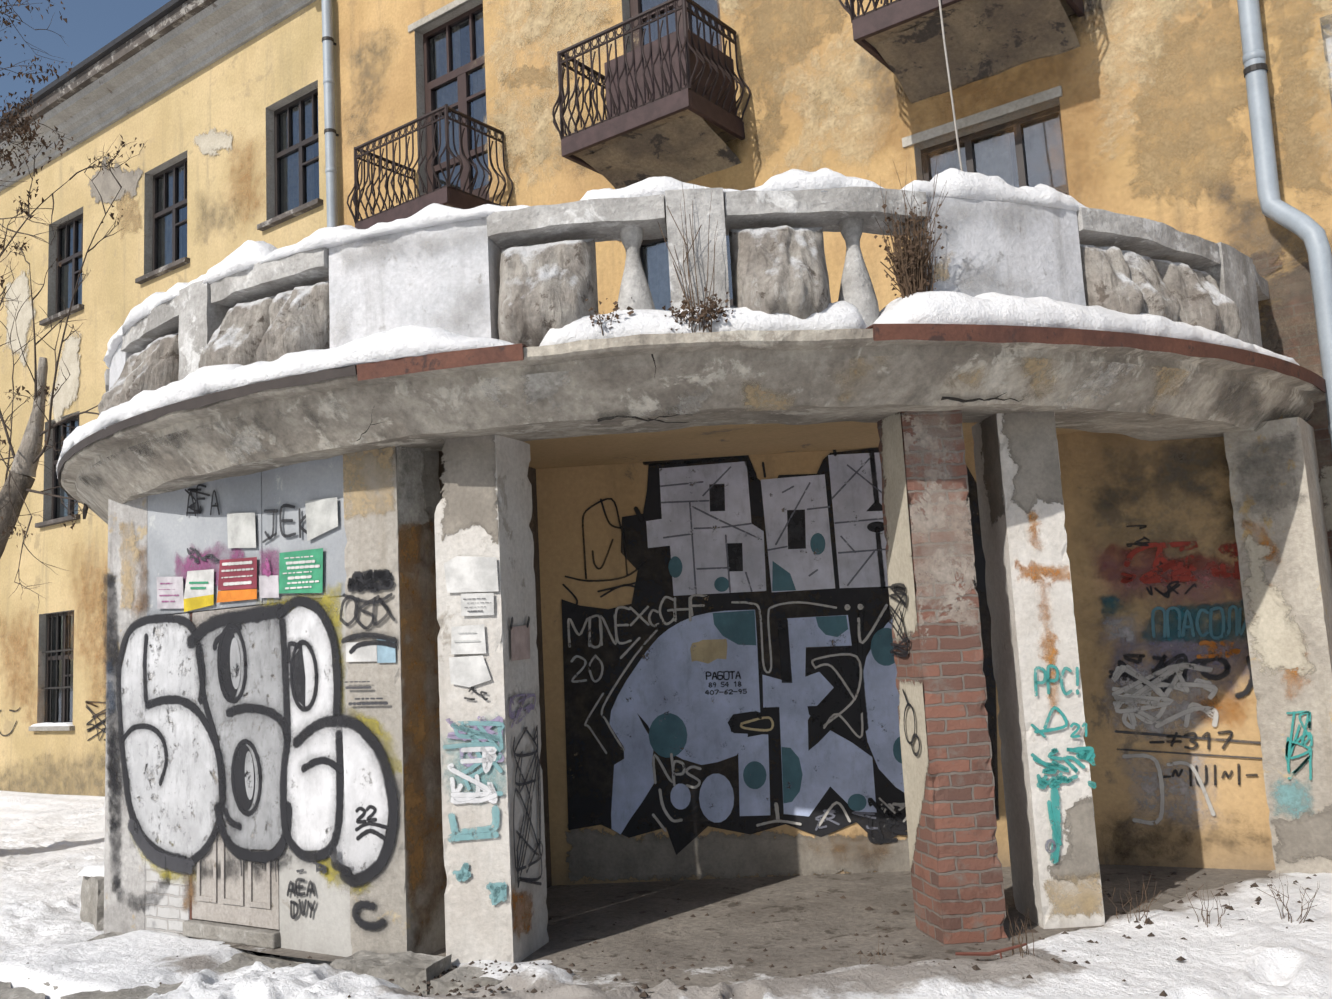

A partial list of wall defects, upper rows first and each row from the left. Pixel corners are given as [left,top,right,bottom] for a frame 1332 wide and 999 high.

flaking render [88,156,143,232]
flaking render [1252,250,1323,378]
spalling [343,434,498,544]
flaking render [881,411,977,645]
spalling [980,411,1063,524]
rust [1015,561,1070,581]
peeling [1243,534,1316,677]
flaking render [1305,400,1332,567]
rust [1043,635,1057,705]
rust [398,518,447,947]
spalling [1044,796,1103,917]
spalling [1271,804,1332,863]